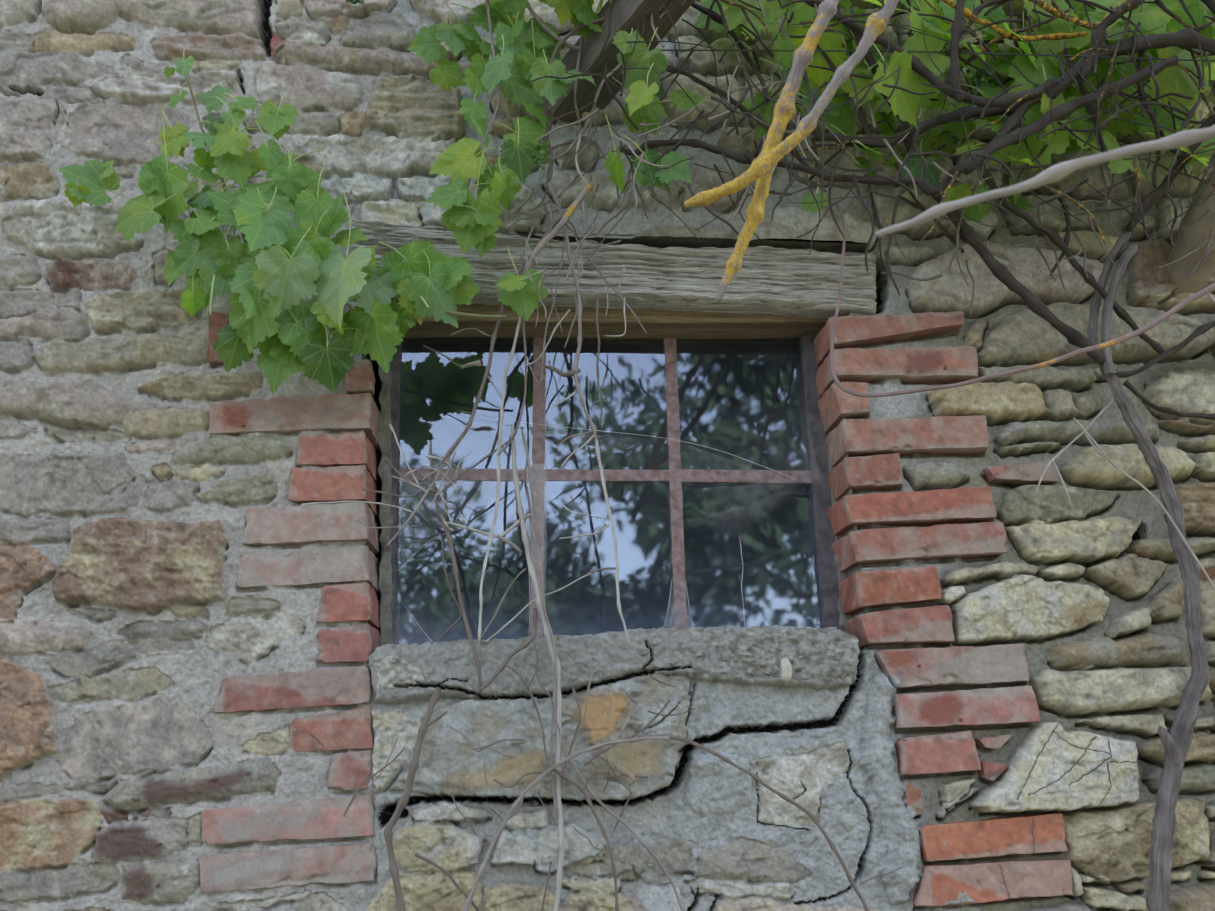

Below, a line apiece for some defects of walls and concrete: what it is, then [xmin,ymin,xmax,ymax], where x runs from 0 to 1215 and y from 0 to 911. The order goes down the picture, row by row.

crack [390,641,870,905]